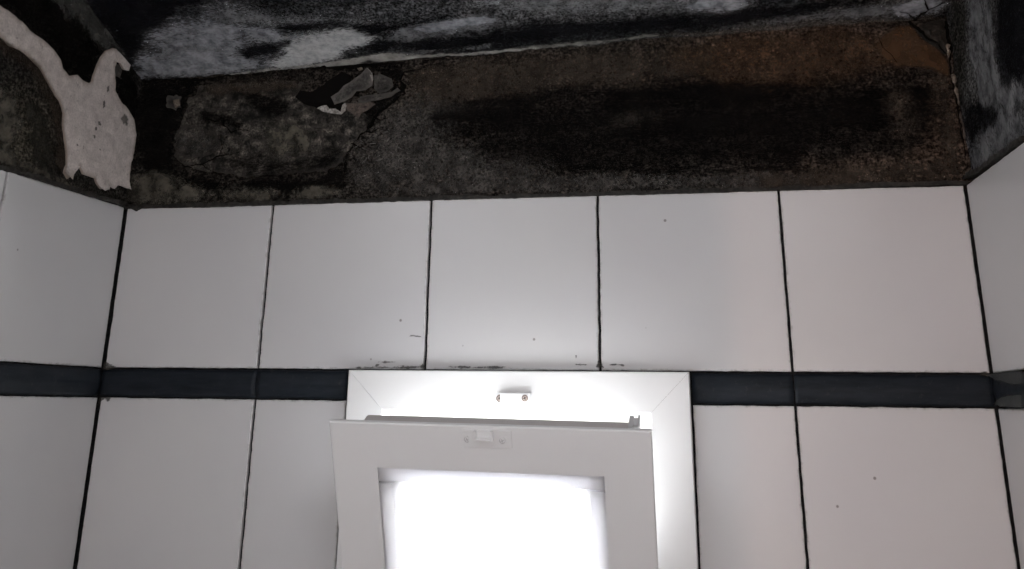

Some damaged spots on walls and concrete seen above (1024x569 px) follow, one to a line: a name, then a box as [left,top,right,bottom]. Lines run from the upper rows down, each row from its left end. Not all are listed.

peeling [0,6,137,191]
peeling [166,60,403,183]
damp [0,0,949,204]
crack [901,0,966,166]
damp [964,0,1024,176]